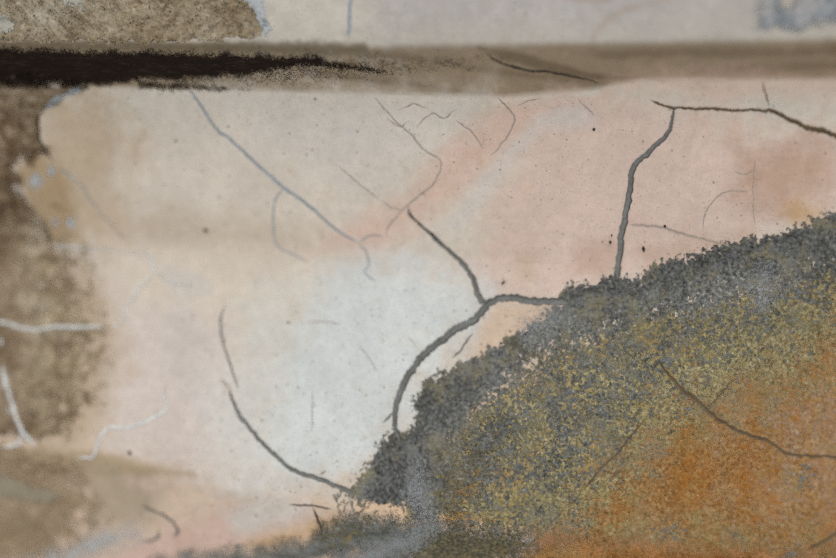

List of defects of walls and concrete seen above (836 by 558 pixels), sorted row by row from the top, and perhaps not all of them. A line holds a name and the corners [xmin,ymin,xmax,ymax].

flaking render [0,0,273,46]
crack [487,54,596,83]
flaking render [0,75,114,444]
crack [189,89,570,441]
crack [615,83,836,280]
crack [219,306,353,493]
crack [289,504,329,532]
water stain [146,207,836,558]
crack [585,421,644,488]
corrosion [532,272,836,558]
crack [657,361,836,459]
crack [809,531,836,550]